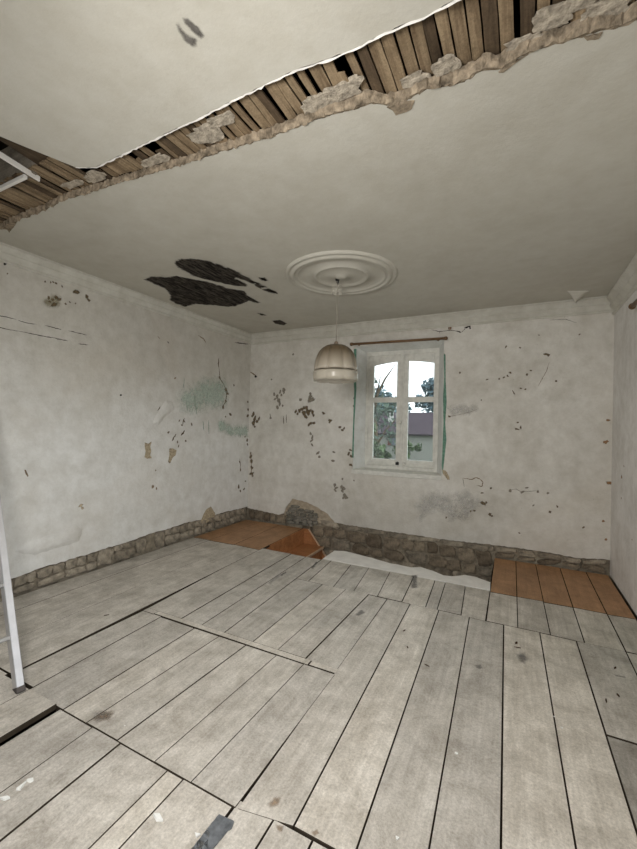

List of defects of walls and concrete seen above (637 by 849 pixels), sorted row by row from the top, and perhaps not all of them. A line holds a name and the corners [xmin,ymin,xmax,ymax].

spalling [0,0,637,233]
crack [218,359,235,416]
peeling [270,388,345,458]
flaking render [12,499,606,594]